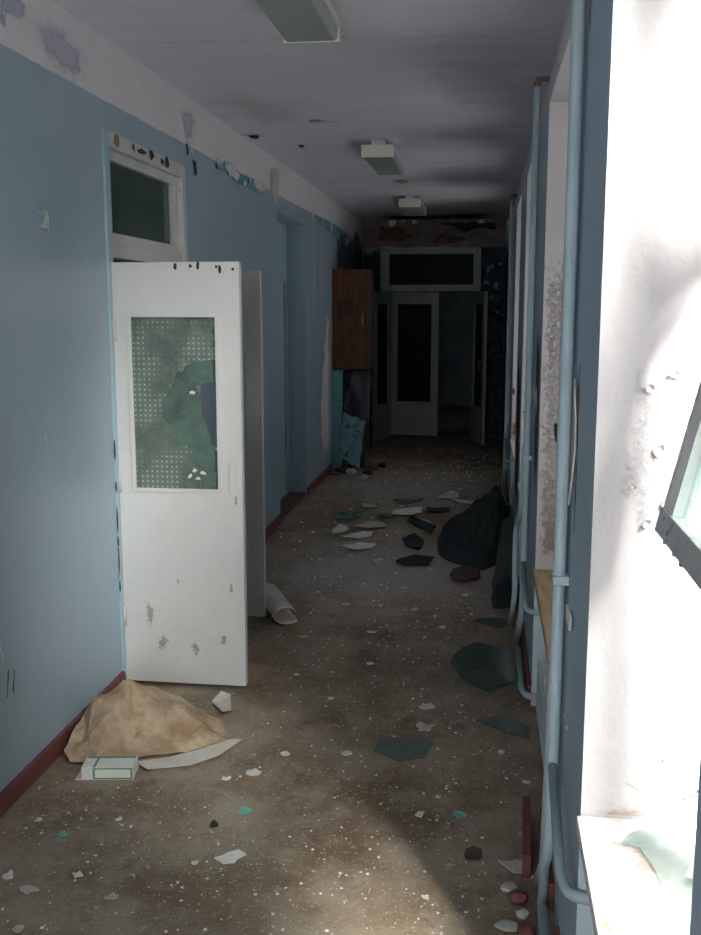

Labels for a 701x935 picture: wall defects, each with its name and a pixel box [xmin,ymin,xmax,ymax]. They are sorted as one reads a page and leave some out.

peeling [532,255,563,541]